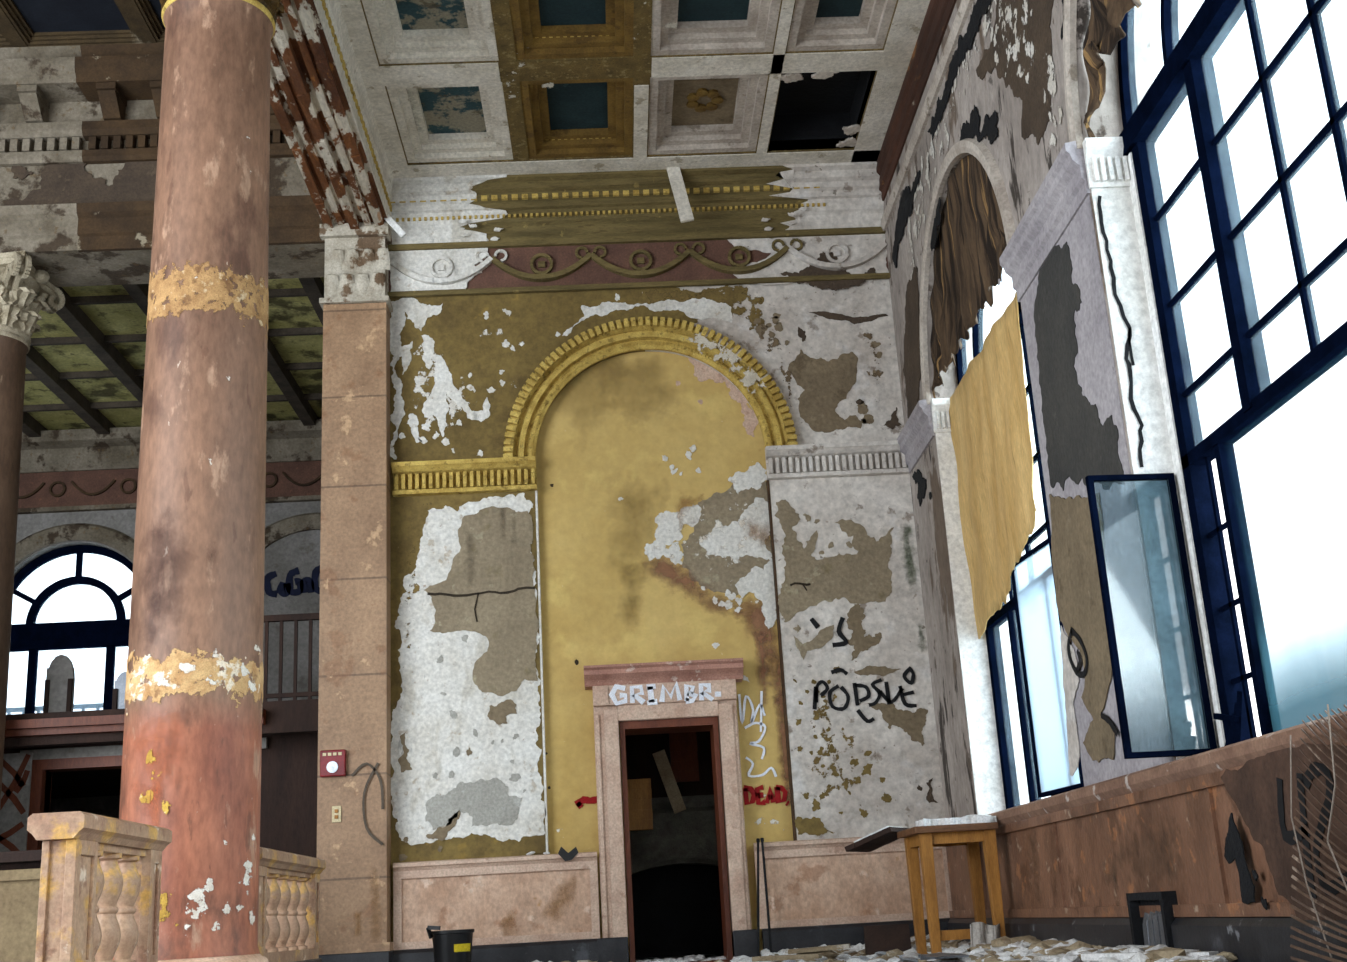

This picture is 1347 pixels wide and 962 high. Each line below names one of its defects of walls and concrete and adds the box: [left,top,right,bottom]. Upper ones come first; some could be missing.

flaking render [3,161,157,206]
peeling [338,0,1064,460]
peeling [662,445,701,476]
flaking render [912,469,932,506]
flaking render [1034,242,1125,776]
crack [427,587,535,622]
peeling [124,645,264,716]
peeling [390,493,560,861]
flaking render [644,462,899,836]
flaking render [871,703,928,746]
flaking render [917,778,938,803]
peeling [184,833,255,931]